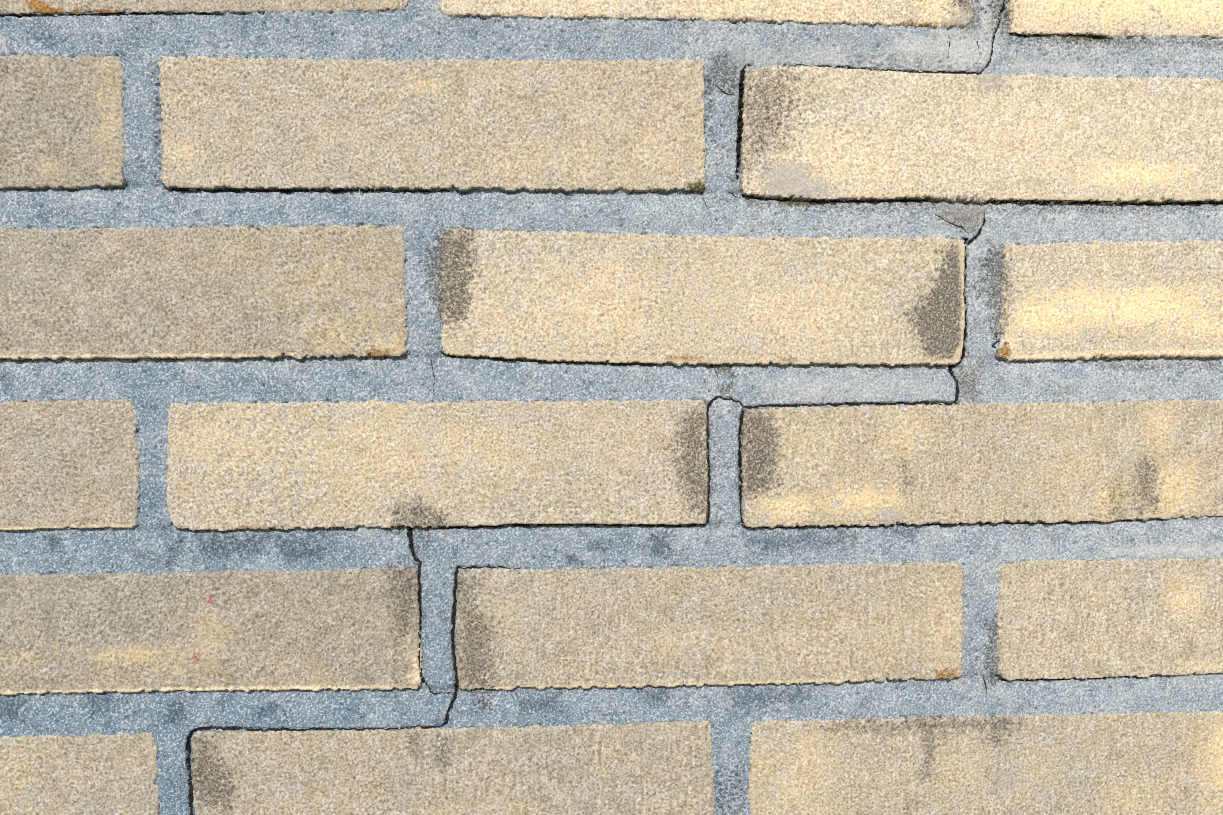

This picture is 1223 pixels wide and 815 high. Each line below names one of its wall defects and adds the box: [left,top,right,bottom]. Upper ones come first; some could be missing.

crack [789,0,1005,75]
crack [704,64,751,210]
crack [185,210,986,815]